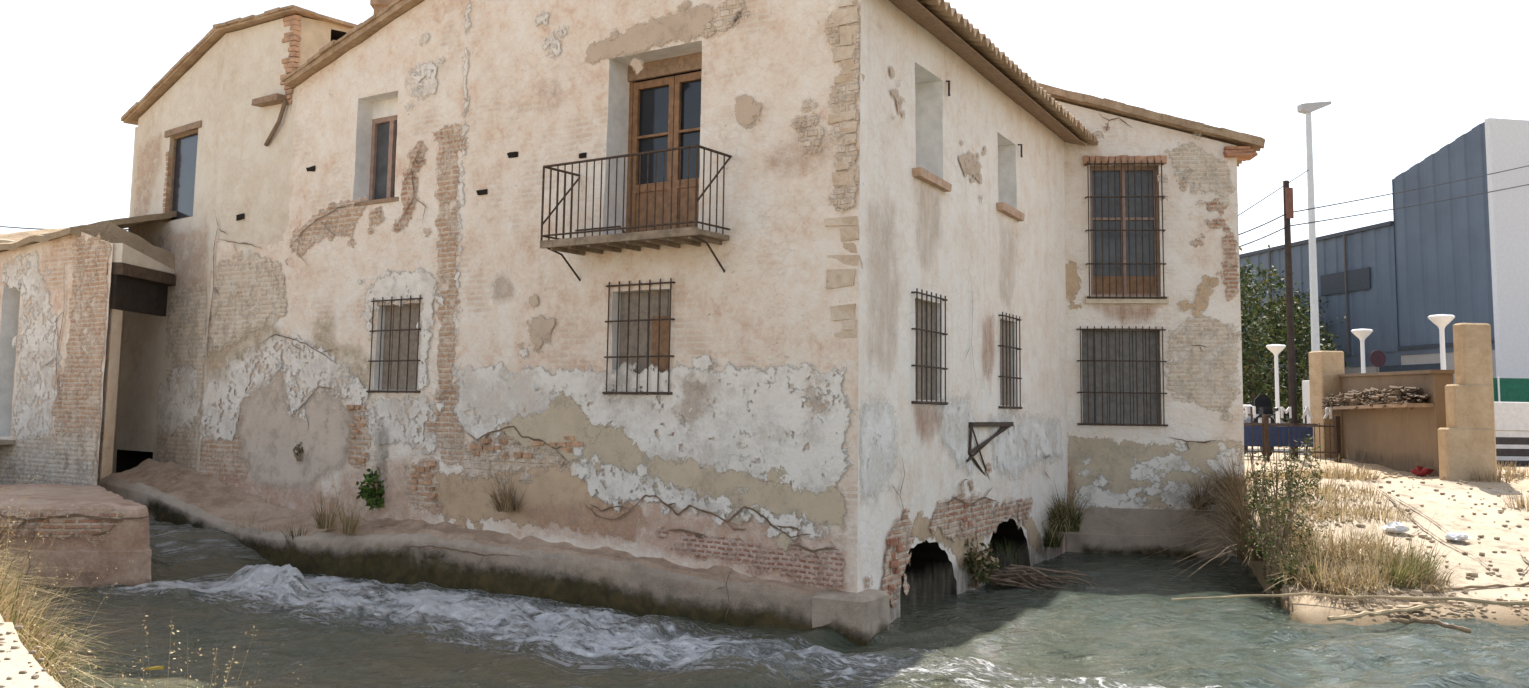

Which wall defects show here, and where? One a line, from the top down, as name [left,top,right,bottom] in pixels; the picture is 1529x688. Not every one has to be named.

flaking render [701,0,750,38]
flaking render [791,0,859,213]
flaking render [0,233,111,486]
crack [463,426,572,468]
flaking render [157,123,897,589]
crack [583,494,839,560]
flaking render [865,133,1245,608]